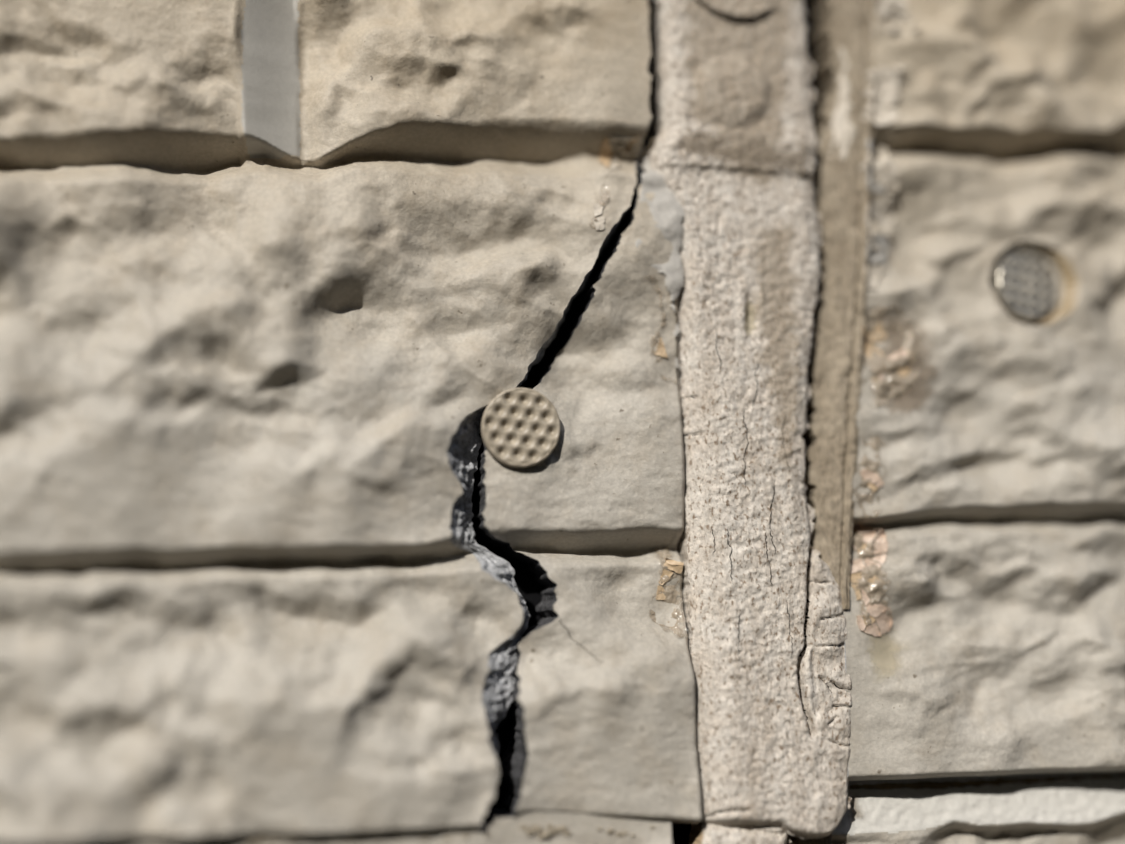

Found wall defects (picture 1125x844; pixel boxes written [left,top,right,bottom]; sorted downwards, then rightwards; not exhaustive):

crack [804,0,822,121]
crack [516,24,652,389]
peeling [860,66,906,290]
peeling [862,306,922,407]
crack [447,405,604,828]
peeling [850,436,892,637]